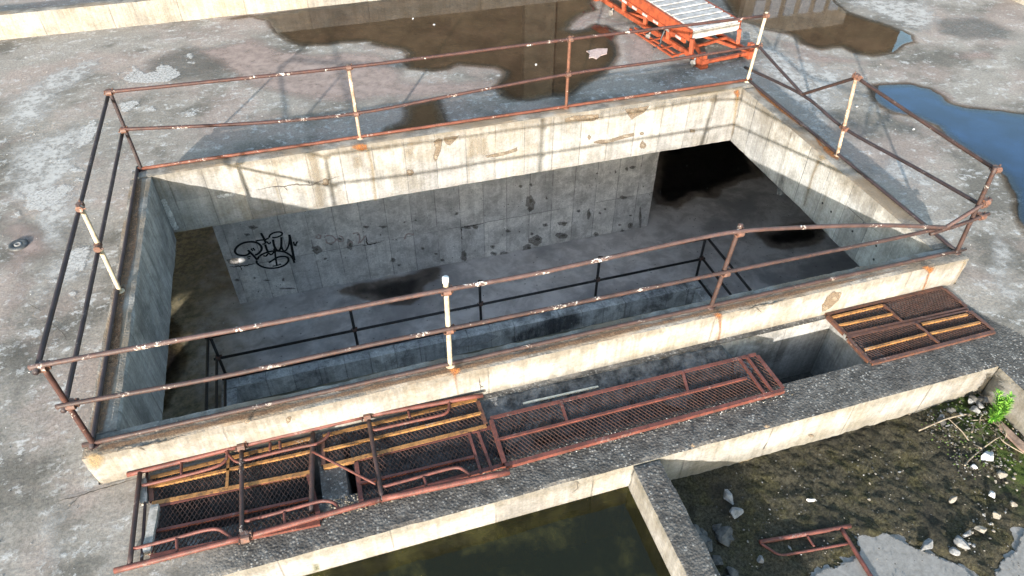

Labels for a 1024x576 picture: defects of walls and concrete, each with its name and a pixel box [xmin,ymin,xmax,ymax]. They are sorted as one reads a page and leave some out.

damp [151,41,486,100]
spalling [433,136,458,161]
spalling [587,132,646,148]
spalling [822,292,842,312]
corrosion [89,271,891,467]